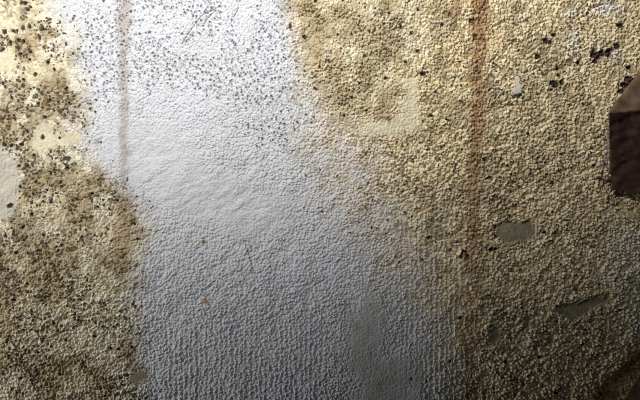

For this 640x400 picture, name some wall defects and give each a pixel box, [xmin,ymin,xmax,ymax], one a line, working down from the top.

water stain [487,58,545,133]
spalling [617,65,635,94]
water stain [0,0,449,400]
rust [443,0,495,400]
spalling [488,219,553,253]
water stain [483,142,573,221]
spalling [554,284,622,324]